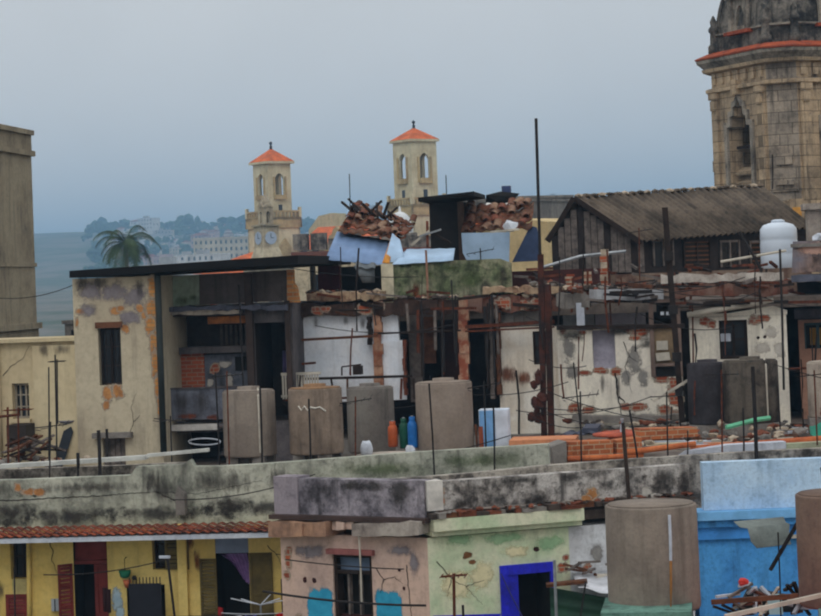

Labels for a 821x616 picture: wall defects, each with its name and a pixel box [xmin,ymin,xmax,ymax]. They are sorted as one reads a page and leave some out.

peeling [75,273,159,419]
flaking render [560,329,685,415]
damp [0,505,114,527]
damp [124,498,275,520]
damp [657,471,688,492]
peeling [442,535,493,598]